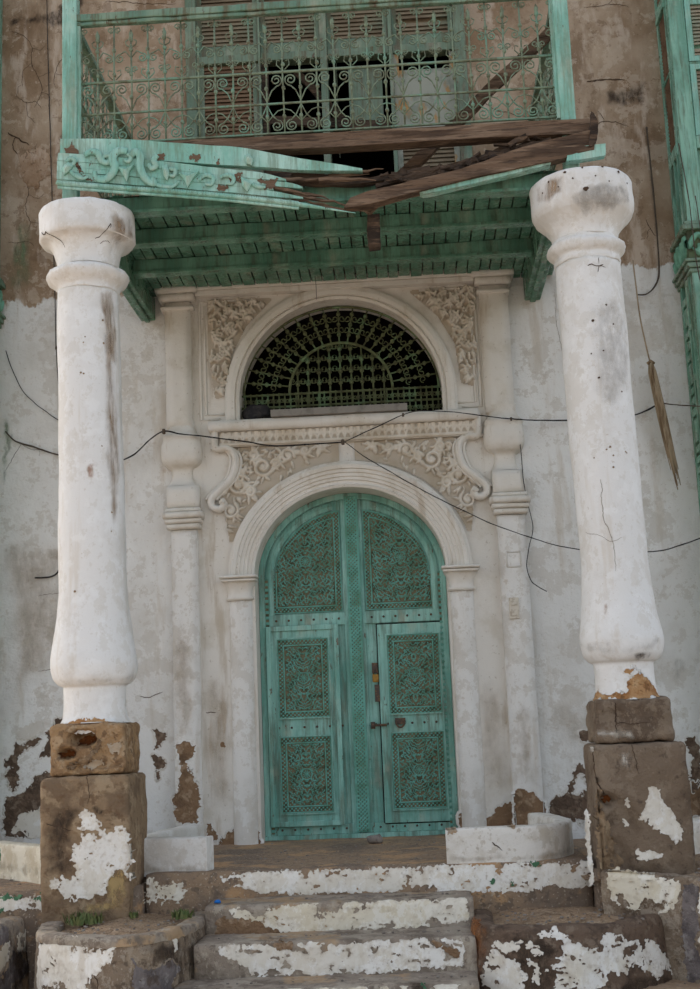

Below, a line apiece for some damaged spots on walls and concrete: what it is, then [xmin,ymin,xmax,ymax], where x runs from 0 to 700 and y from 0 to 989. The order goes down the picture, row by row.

crack [8,31,62,154]
crack [15,186,65,262]
crack [586,480,622,571]
flaking render [591,665,660,701]
flaking render [0,715,126,840]
flaking render [150,727,234,845]
flaking render [682,734,700,818]
peeling [0,808,188,913]
peeling [215,762,700,989]
peeling [0,925,117,989]
spalling [129,939,181,989]